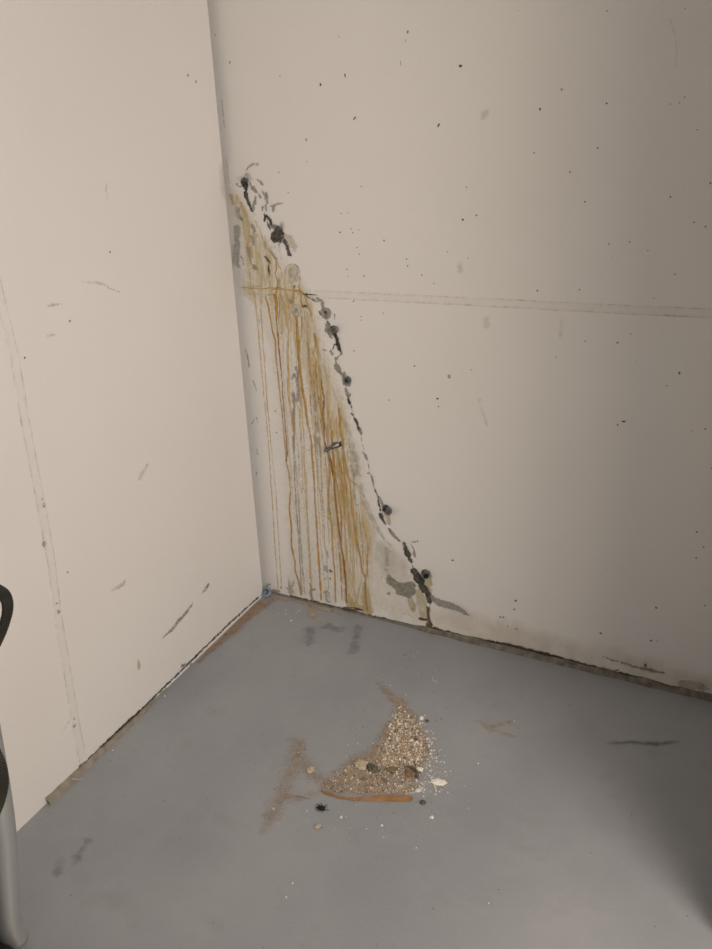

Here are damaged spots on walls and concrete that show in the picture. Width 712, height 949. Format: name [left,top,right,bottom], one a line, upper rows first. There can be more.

rust [209,603,266,651]
rust [231,194,373,617]
crack [241,180,709,694]